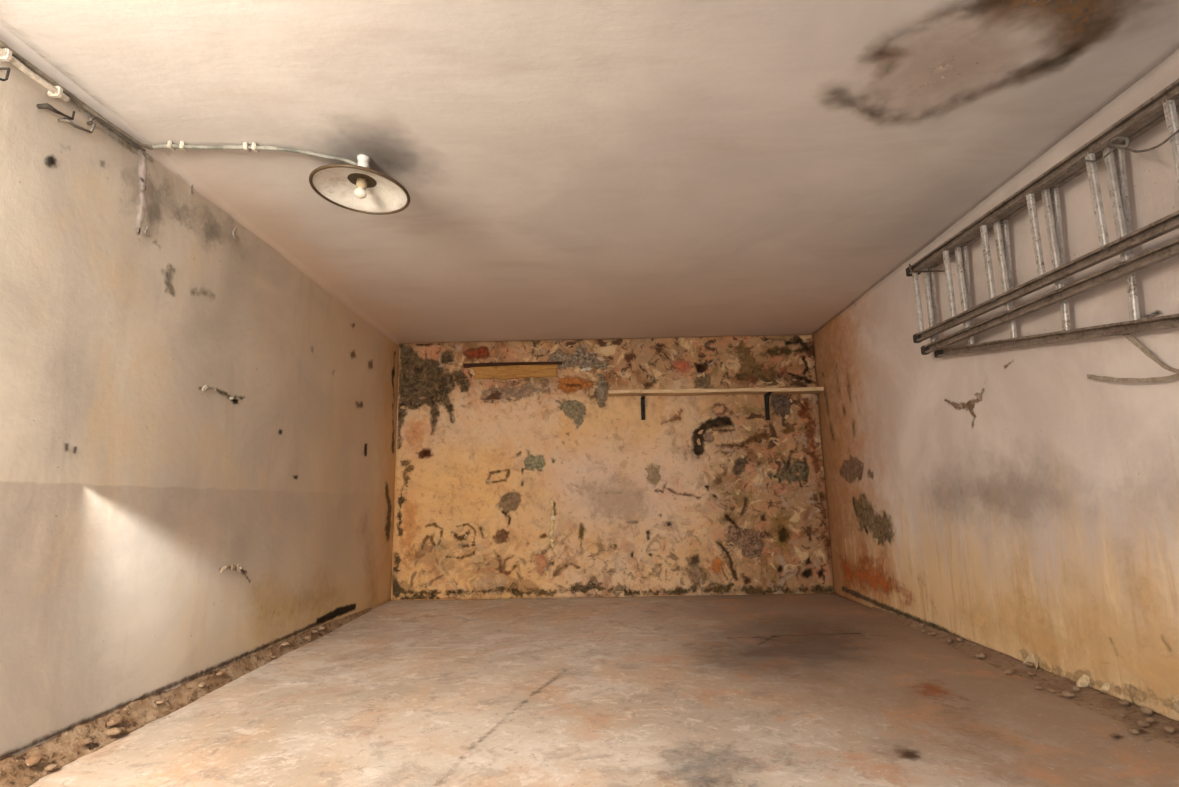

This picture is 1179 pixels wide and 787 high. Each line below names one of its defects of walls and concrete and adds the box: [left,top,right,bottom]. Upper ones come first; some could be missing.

damp [974,0,1116,54]
damp [138,152,147,234]
damp [391,344,471,453]
peeling [481,345,608,434]
spalling [674,348,712,388]
peeling [944,389,984,427]
peeling [396,458,413,536]
peeling [451,453,554,548]
peeling [535,499,580,575]
peeling [645,464,700,499]
peeling [716,497,765,584]
peeling [733,450,809,485]